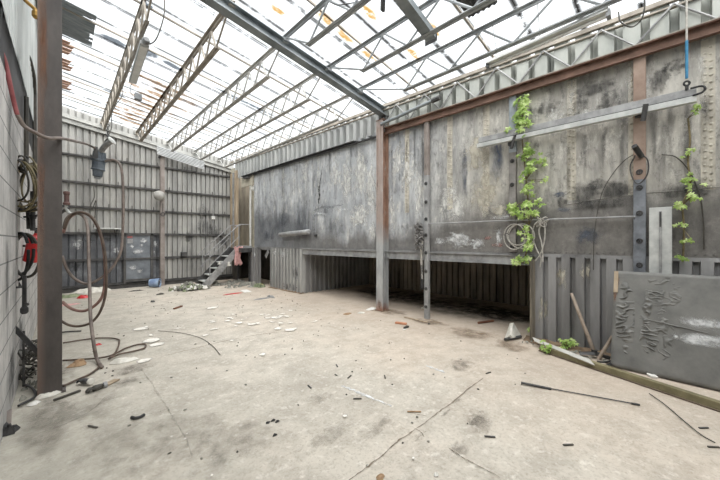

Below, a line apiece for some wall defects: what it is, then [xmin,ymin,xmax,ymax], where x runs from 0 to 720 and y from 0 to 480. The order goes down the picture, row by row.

water stain [652,63,685,85]
water stain [576,83,615,114]
efflorescence [331,154,376,223]
peeling [450,233,481,249]
crack [349,378,483,480]